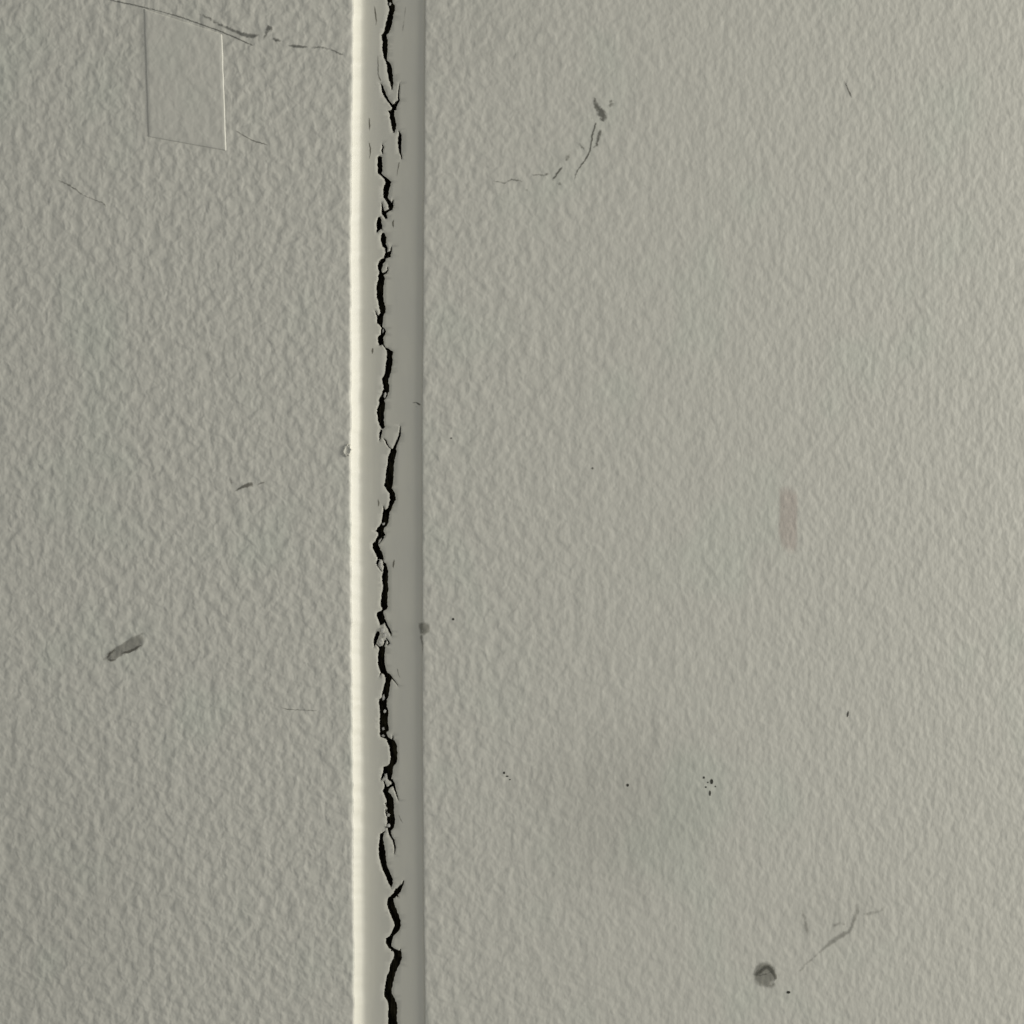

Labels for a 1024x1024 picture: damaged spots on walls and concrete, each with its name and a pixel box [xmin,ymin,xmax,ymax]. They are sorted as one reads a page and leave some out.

crack [369,0,404,1024]
crack [553,100,605,179]